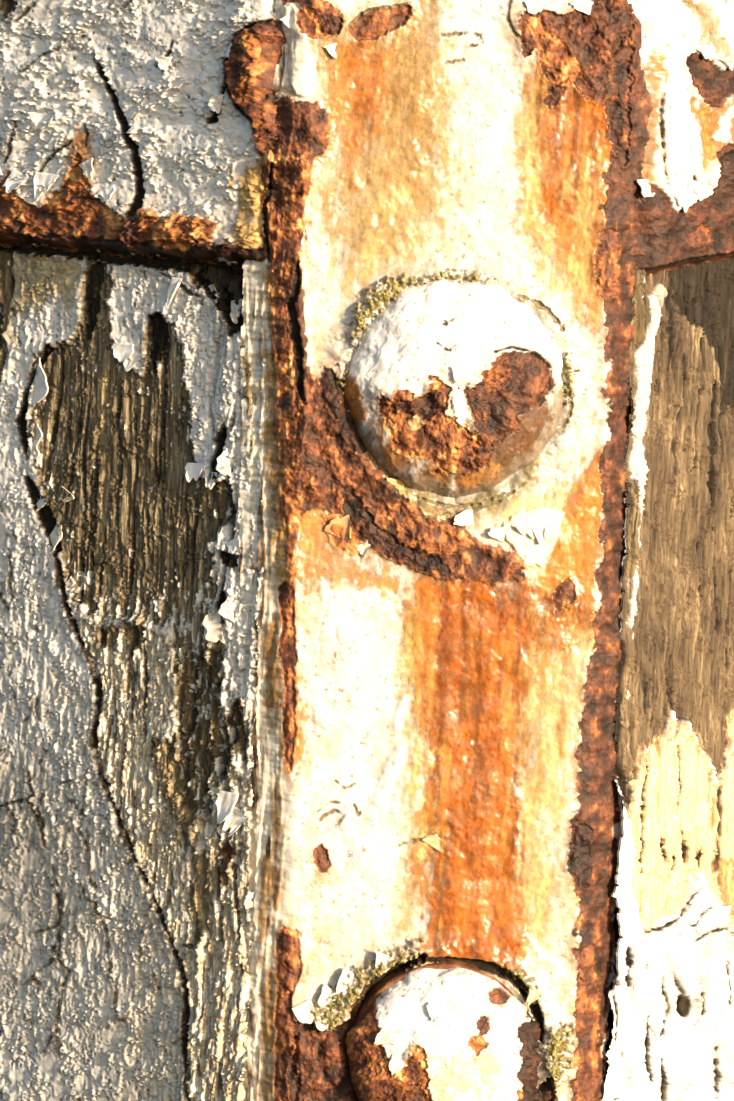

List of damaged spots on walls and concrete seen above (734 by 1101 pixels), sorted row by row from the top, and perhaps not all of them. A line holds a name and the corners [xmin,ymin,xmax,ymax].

crack [0,343,194,1101]
peeling [0,245,261,1101]
rust [0,0,604,774]
rust [256,786,505,1101]
rust [400,0,734,1101]
peeling [612,258,734,1042]